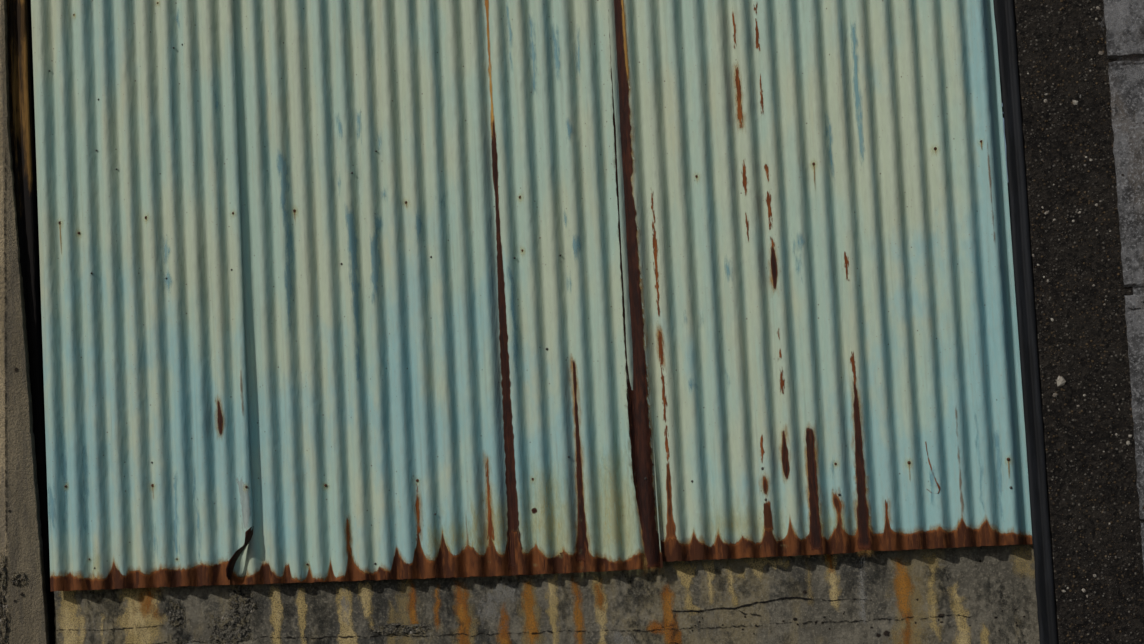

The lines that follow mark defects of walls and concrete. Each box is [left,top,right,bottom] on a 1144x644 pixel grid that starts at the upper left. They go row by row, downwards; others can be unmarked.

rust [50,0,663,628]
rust [611,0,1032,568]
leakage [58,587,198,644]
crack [56,625,218,644]
leakage [256,582,397,644]
rust [453,583,478,644]
rust [520,581,543,644]
crack [262,597,970,644]
rust [647,584,681,644]
leakage [672,557,811,614]
leakage [824,554,881,621]
leakage [923,553,1024,644]